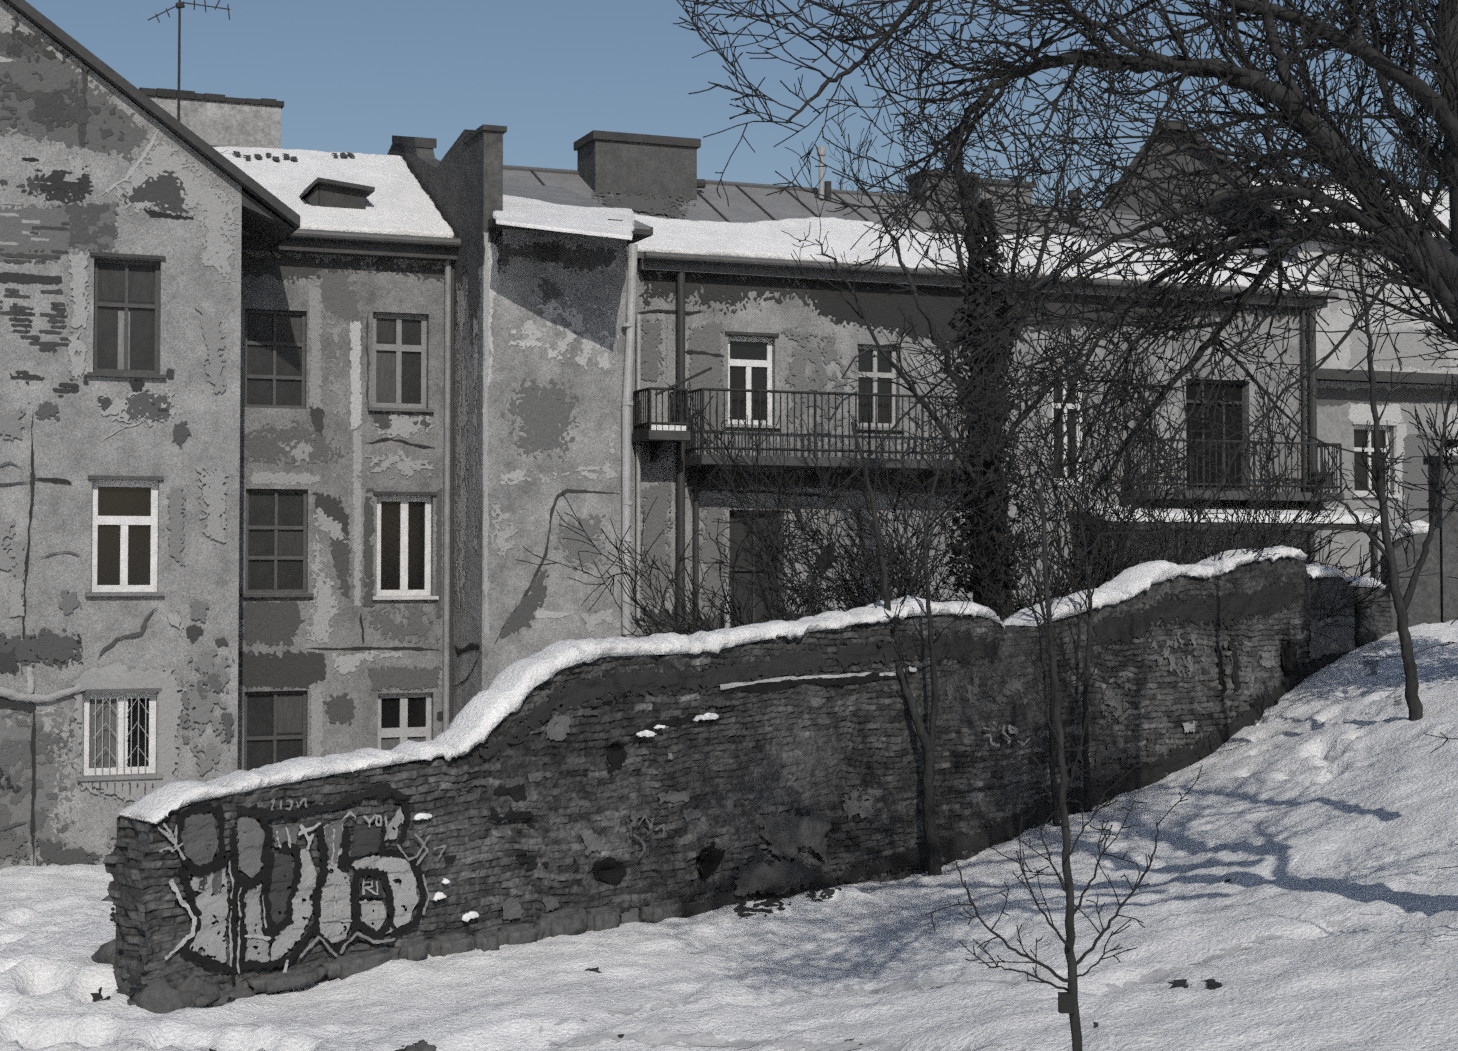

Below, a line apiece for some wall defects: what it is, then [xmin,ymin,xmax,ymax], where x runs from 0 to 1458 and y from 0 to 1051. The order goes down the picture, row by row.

flaking render [0,126,239,427]
peeling [454,233,619,657]
crack [98,607,158,658]
spalling [606,745,628,775]
spalling [573,833,627,885]
spalling [699,841,726,881]